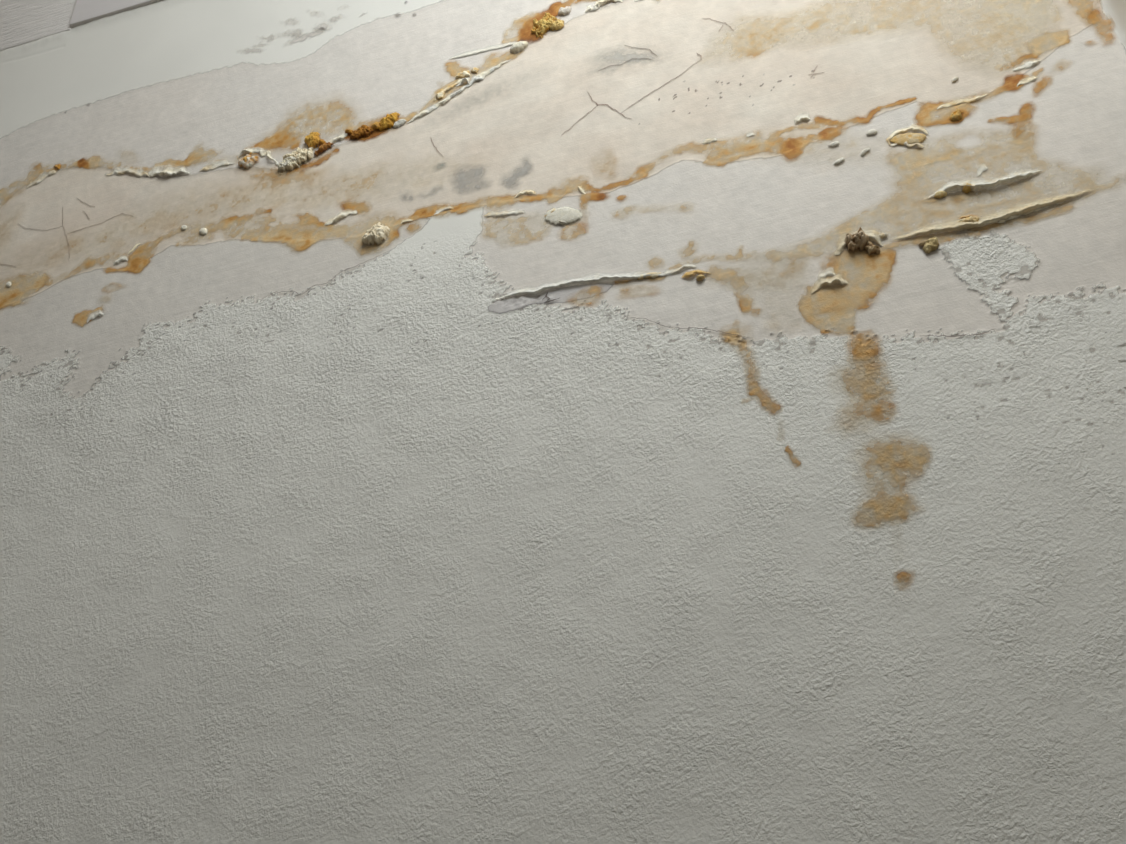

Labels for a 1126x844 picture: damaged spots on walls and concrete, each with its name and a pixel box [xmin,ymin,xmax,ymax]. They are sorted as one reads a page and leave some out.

peeling [0,0,623,204]
crack [565,45,702,132]
crack [19,198,126,257]
leakage [0,0,1118,421]
peeling [464,0,1126,353]
peeling [0,218,430,411]
leakage [785,446,801,466]
leakage [856,441,930,527]
leakage [896,572,911,582]